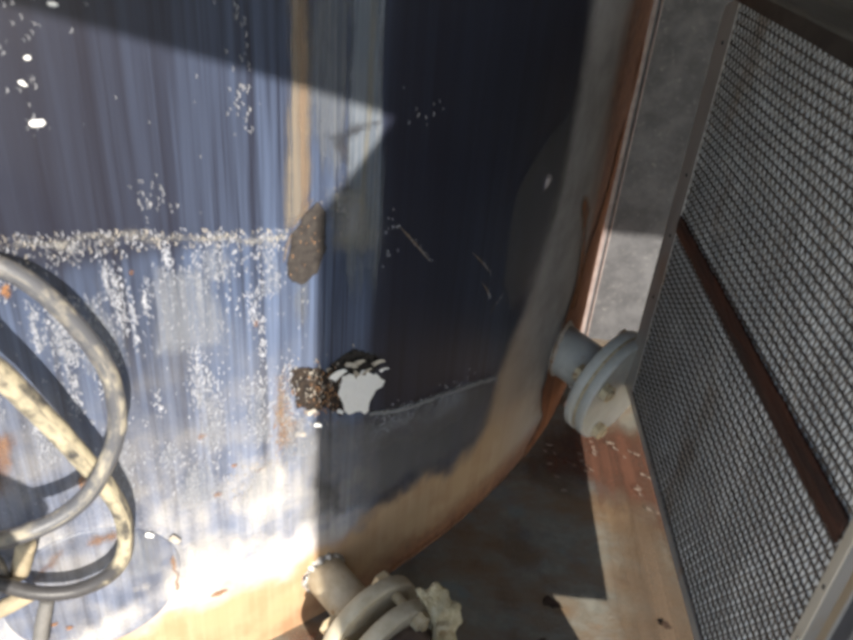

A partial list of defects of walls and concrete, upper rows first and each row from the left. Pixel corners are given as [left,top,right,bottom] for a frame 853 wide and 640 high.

water stain [0,0,498,521]
rust [270,357,346,461]
peeling [327,349,389,415]
rust [519,119,694,640]